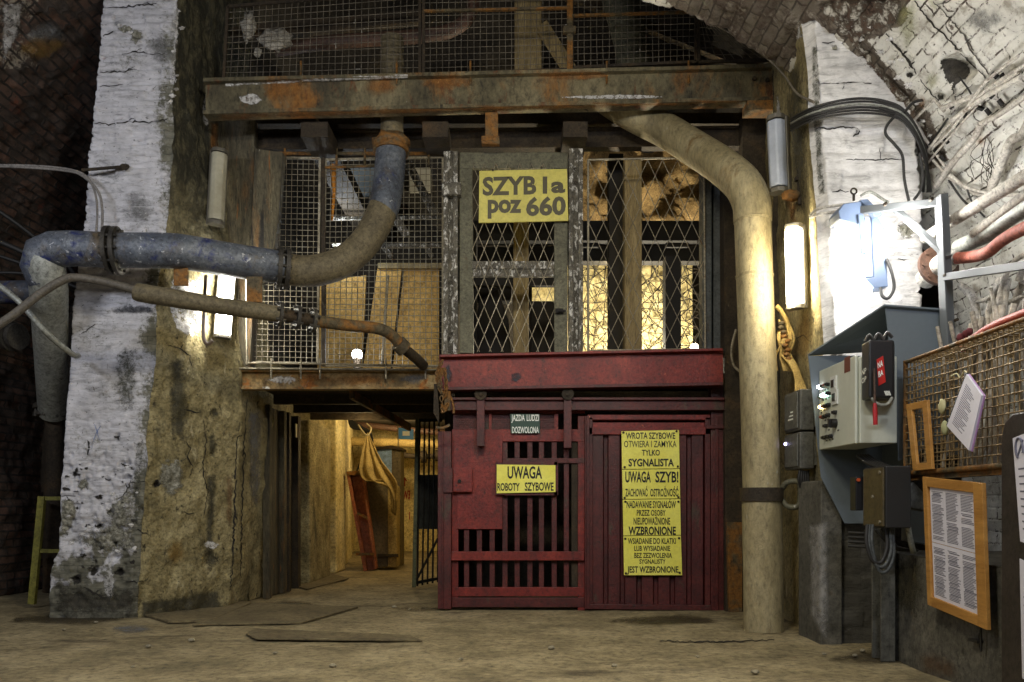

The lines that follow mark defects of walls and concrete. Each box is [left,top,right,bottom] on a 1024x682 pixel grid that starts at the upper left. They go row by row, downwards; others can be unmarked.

spalling [937,59,970,100]
crack [95,118,168,126]
leakage [114,349,136,408]
spalling [61,464,138,585]
crack [230,400,248,590]